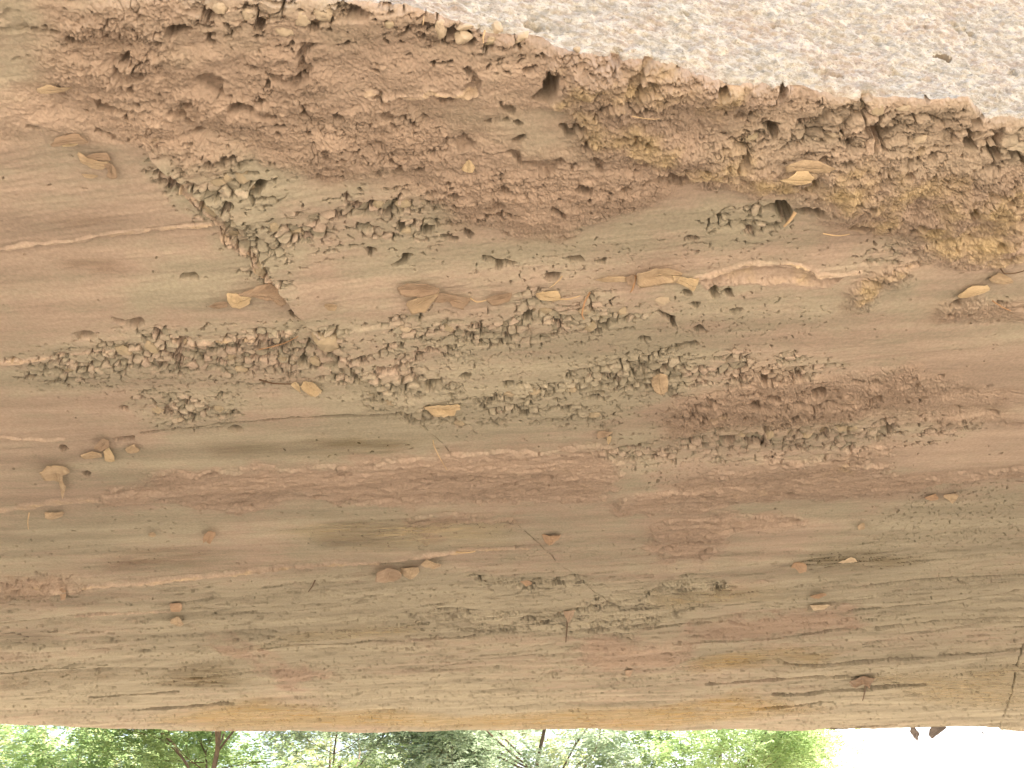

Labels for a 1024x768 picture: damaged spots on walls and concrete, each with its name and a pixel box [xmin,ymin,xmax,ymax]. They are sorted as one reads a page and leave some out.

spalling [439,226,843,390]
crack [999,643,1024,729]